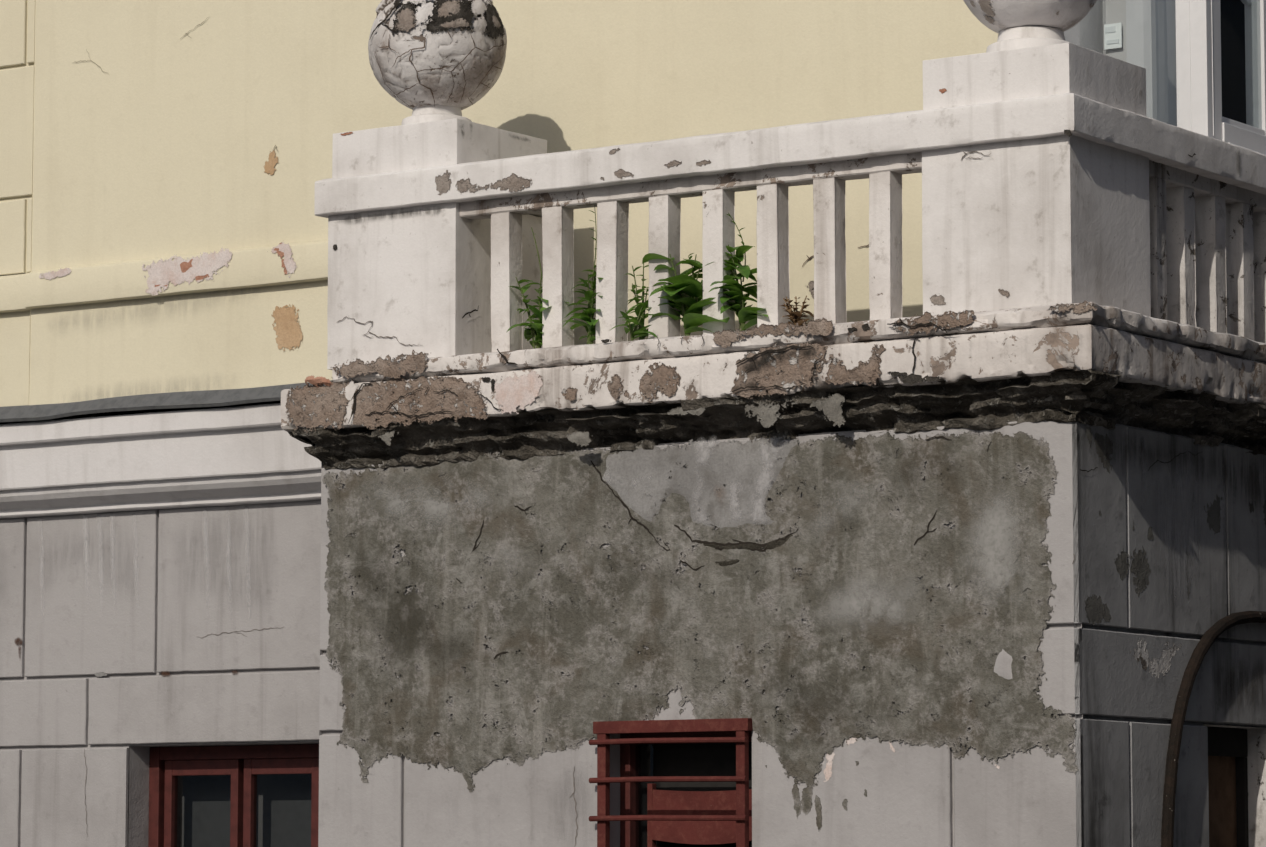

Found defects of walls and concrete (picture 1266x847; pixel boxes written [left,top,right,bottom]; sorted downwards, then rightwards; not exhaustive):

spalling [392,0,505,41]
crack [370,0,507,107]
peeling [435,170,532,195]
peeling [142,248,232,296]
peeling [271,304,303,351]
spalling [891,294,974,336]
spalling [285,350,543,449]
peeling [567,431,593,447]
peeling [602,318,940,528]
crack [591,461,798,570]
leakage [1085,594,1111,625]
peeling [994,649,1013,680]